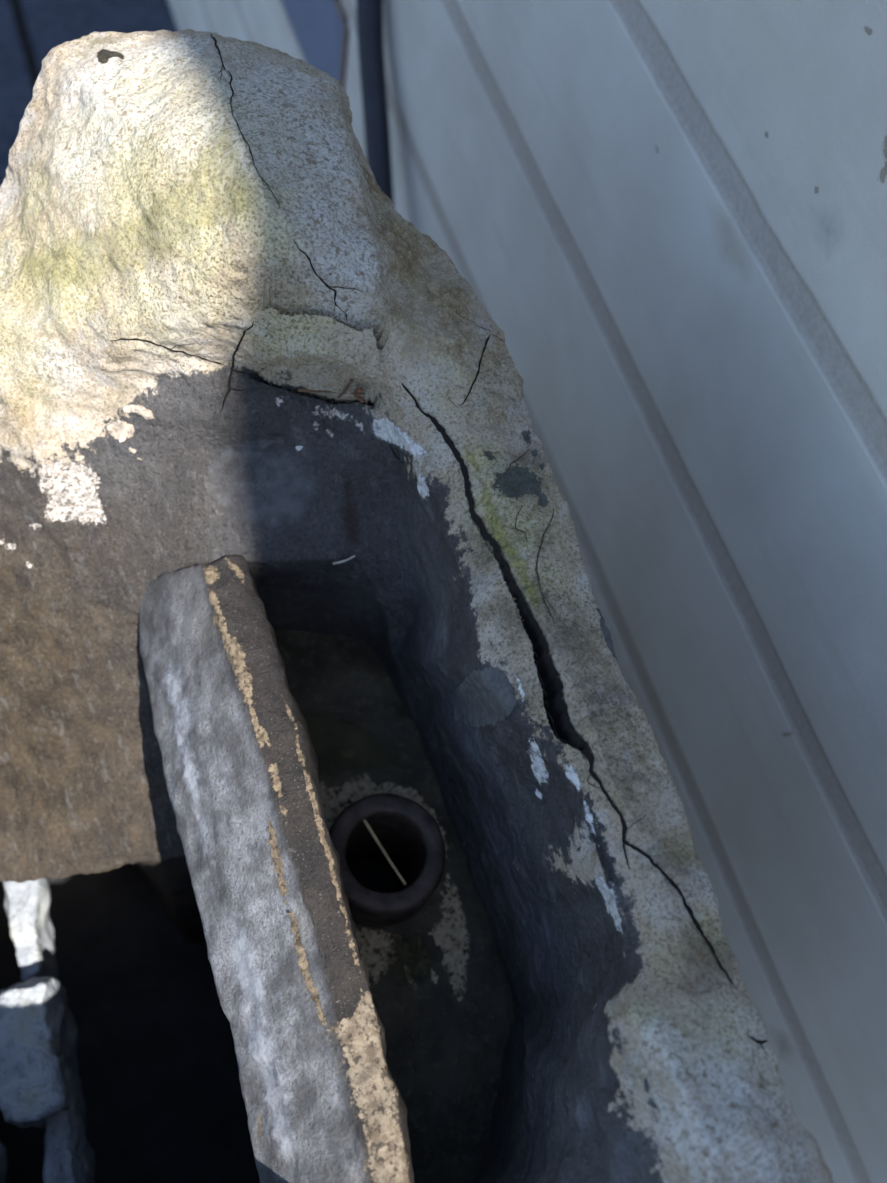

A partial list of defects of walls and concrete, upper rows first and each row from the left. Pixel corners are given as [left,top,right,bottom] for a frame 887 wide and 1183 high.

crack [211,34,281,210]
crack [294,242,362,321]
crack [111,321,254,414]
peeling [103,404,155,460]
peeling [306,405,364,438]
peeling [30,459,107,529]
crack [402,312,738,989]